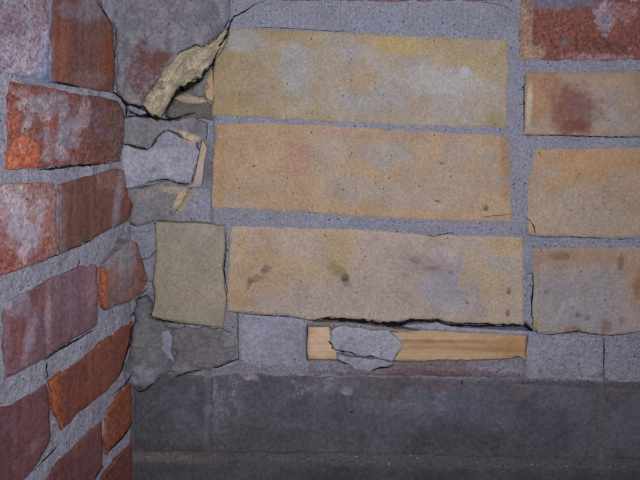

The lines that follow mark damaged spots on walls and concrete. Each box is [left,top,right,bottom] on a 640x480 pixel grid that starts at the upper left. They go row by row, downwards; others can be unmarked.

crack [105,1,264,121]
peeling [330,324,403,371]
crack [111,233,639,397]